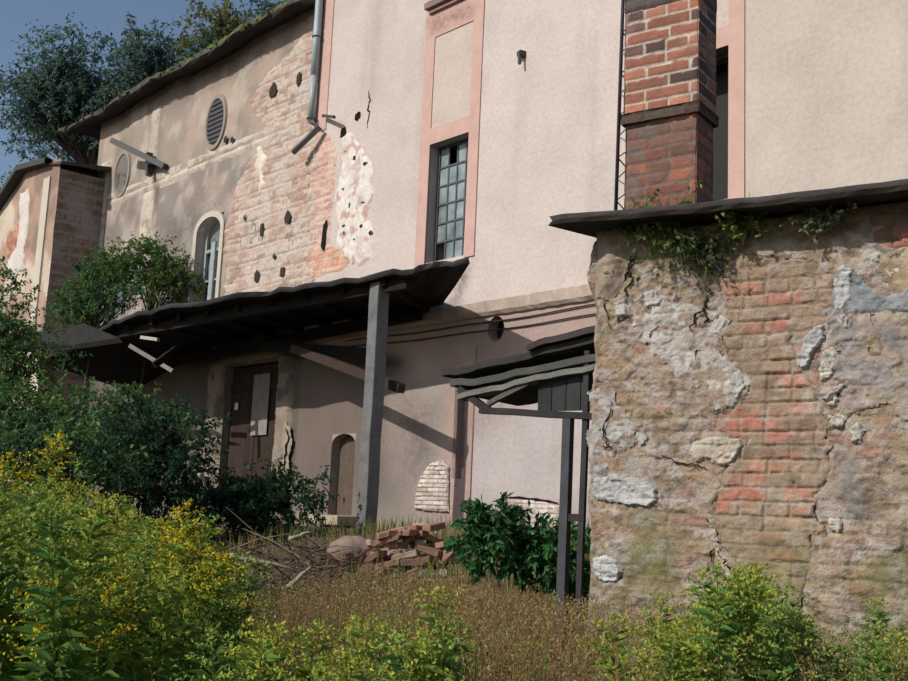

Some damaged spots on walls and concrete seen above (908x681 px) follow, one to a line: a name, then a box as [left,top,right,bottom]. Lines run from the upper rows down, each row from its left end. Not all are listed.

spalling [223,0,375,296]
flaking render [6,188,30,280]
spalling [868,208,908,294]
crack [603,253,636,328]
crack [689,288,712,330]
spalling [414,460,449,512]
crack [601,403,614,449]
flaking render [586,387,658,507]
crack [661,455,706,469]
spalling [613,252,908,612]
crack [706,515,732,582]